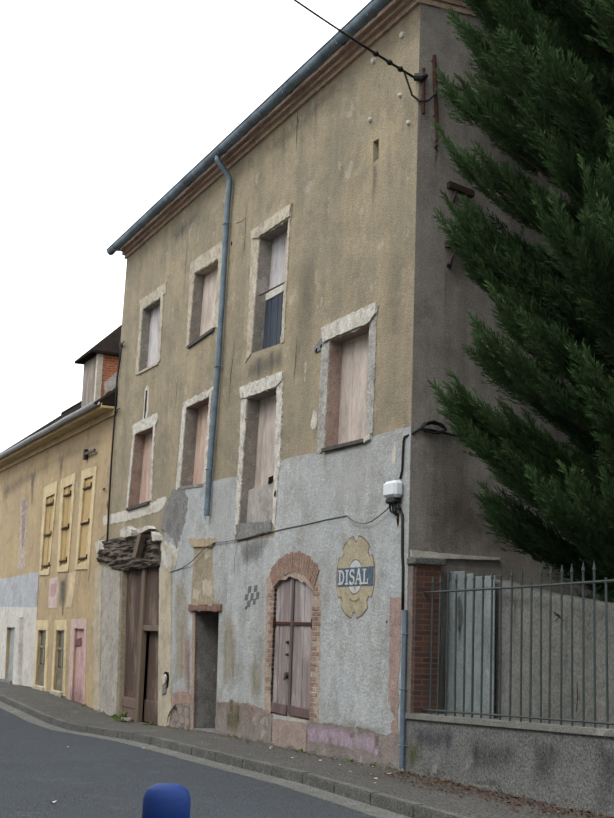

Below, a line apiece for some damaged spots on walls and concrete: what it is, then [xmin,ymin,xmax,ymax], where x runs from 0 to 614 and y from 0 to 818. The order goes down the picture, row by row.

flaking render [103,485,188,571]
peeling [387,597,402,734]